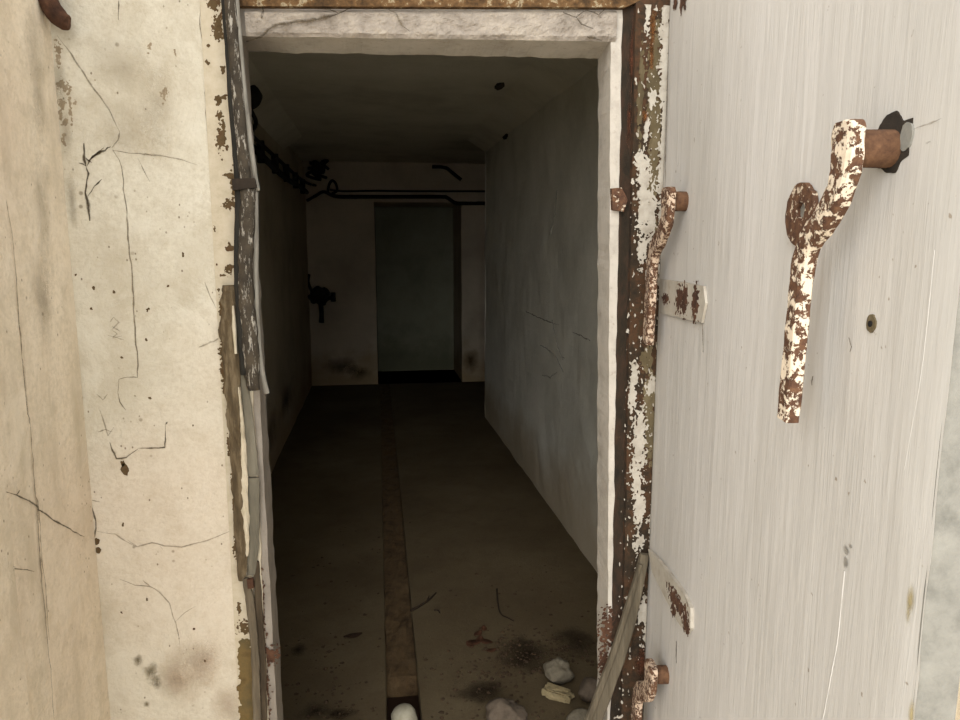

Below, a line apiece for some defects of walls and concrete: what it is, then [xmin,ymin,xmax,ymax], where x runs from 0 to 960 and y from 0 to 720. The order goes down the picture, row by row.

peeling [205,0,226,75]
peeling [214,94,235,211]
crack [61,41,190,459]
peeling [216,263,237,394]
peeling [619,4,670,572]
corrosion [662,280,700,324]
crack [6,202,192,713]
peeling [235,602,249,635]
peeling [614,586,648,719]
corrosion [666,582,690,637]